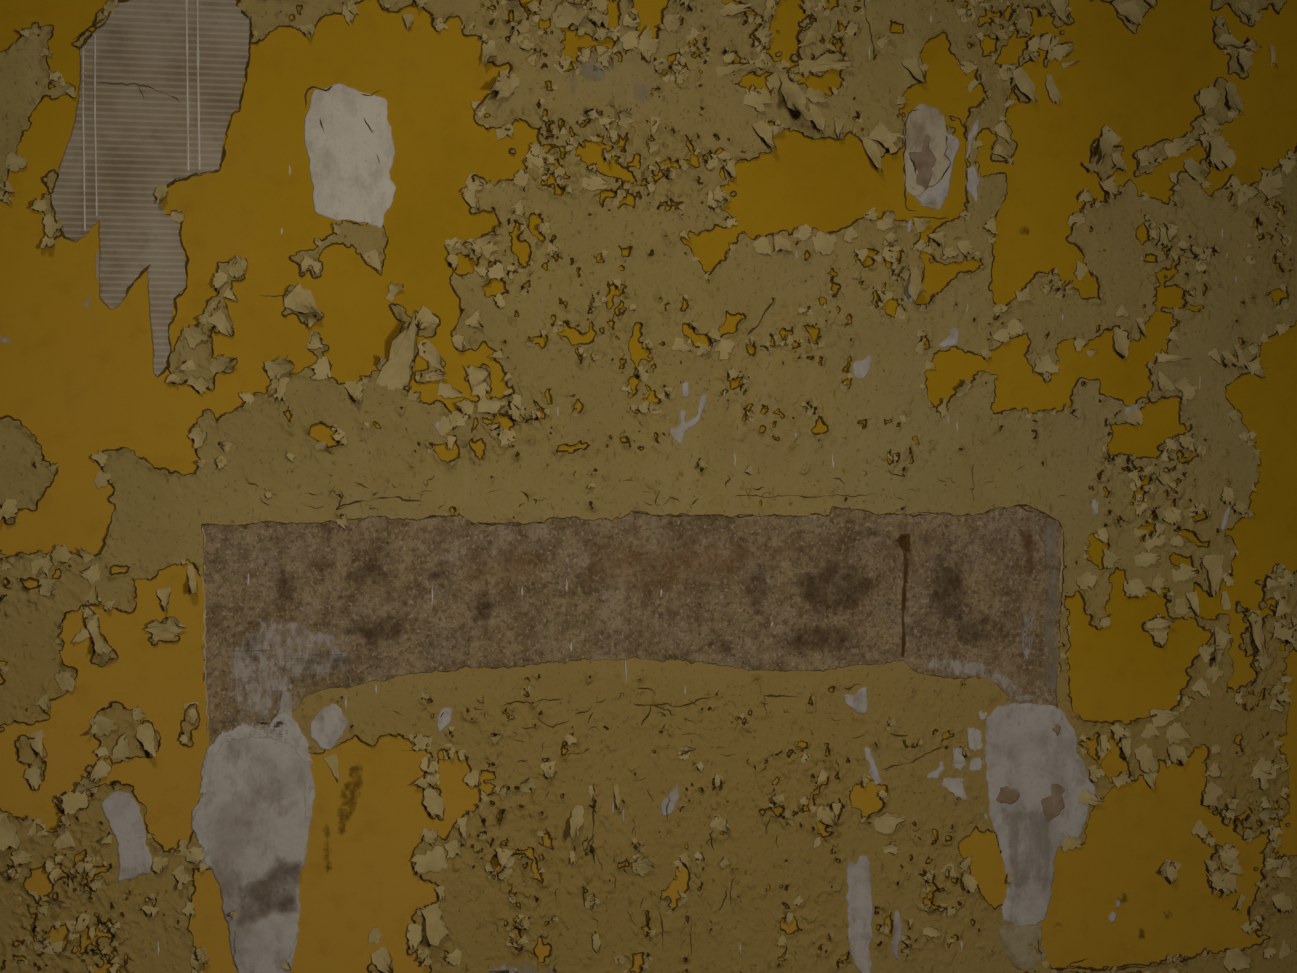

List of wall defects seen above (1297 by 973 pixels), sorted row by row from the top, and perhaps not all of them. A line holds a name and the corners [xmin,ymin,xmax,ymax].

peeling [0,0,651,627]
flaking render [0,446,1075,973]
peeling [468,0,1010,463]
leakage [927,657,1031,702]
peeling [670,0,1297,597]
peeling [1010,188,1297,973]